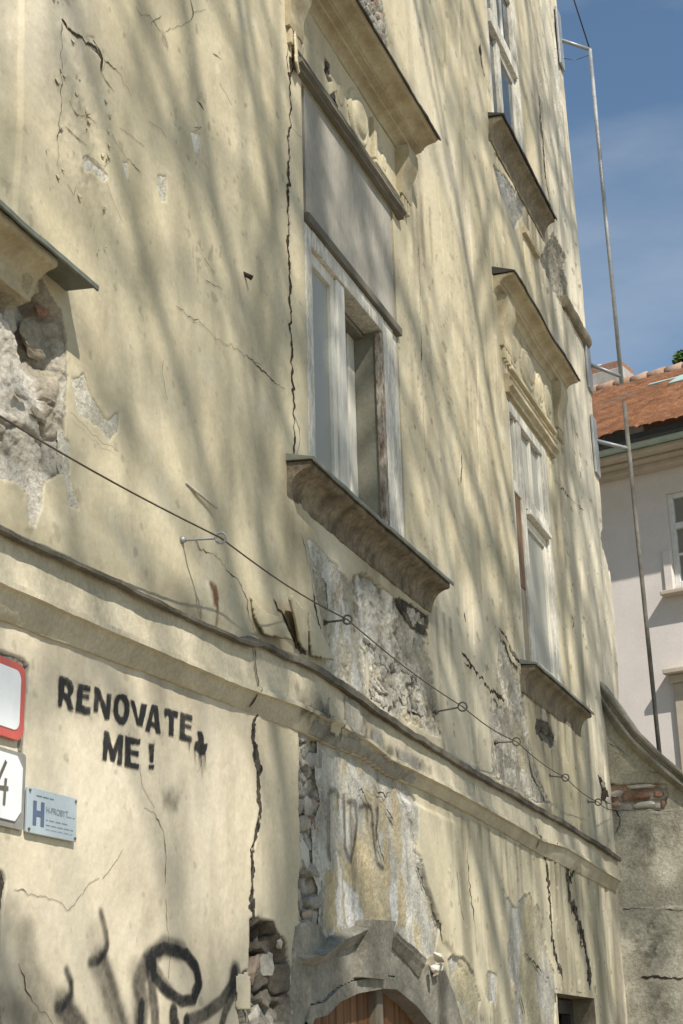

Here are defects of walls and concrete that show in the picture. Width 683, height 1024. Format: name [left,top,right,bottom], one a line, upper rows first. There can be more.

crack [57,18,166,219]
crack [176,35,305,453]
spalling [493,165,523,228]
spalling [540,232,567,310]
spalling [0,272,119,526]
crack [196,541,289,922]
peeling [298,540,496,1024]
crack [463,652,504,708]
crack [525,750,592,985]
spalling [598,775,668,812]
spalling [237,918,293,1024]